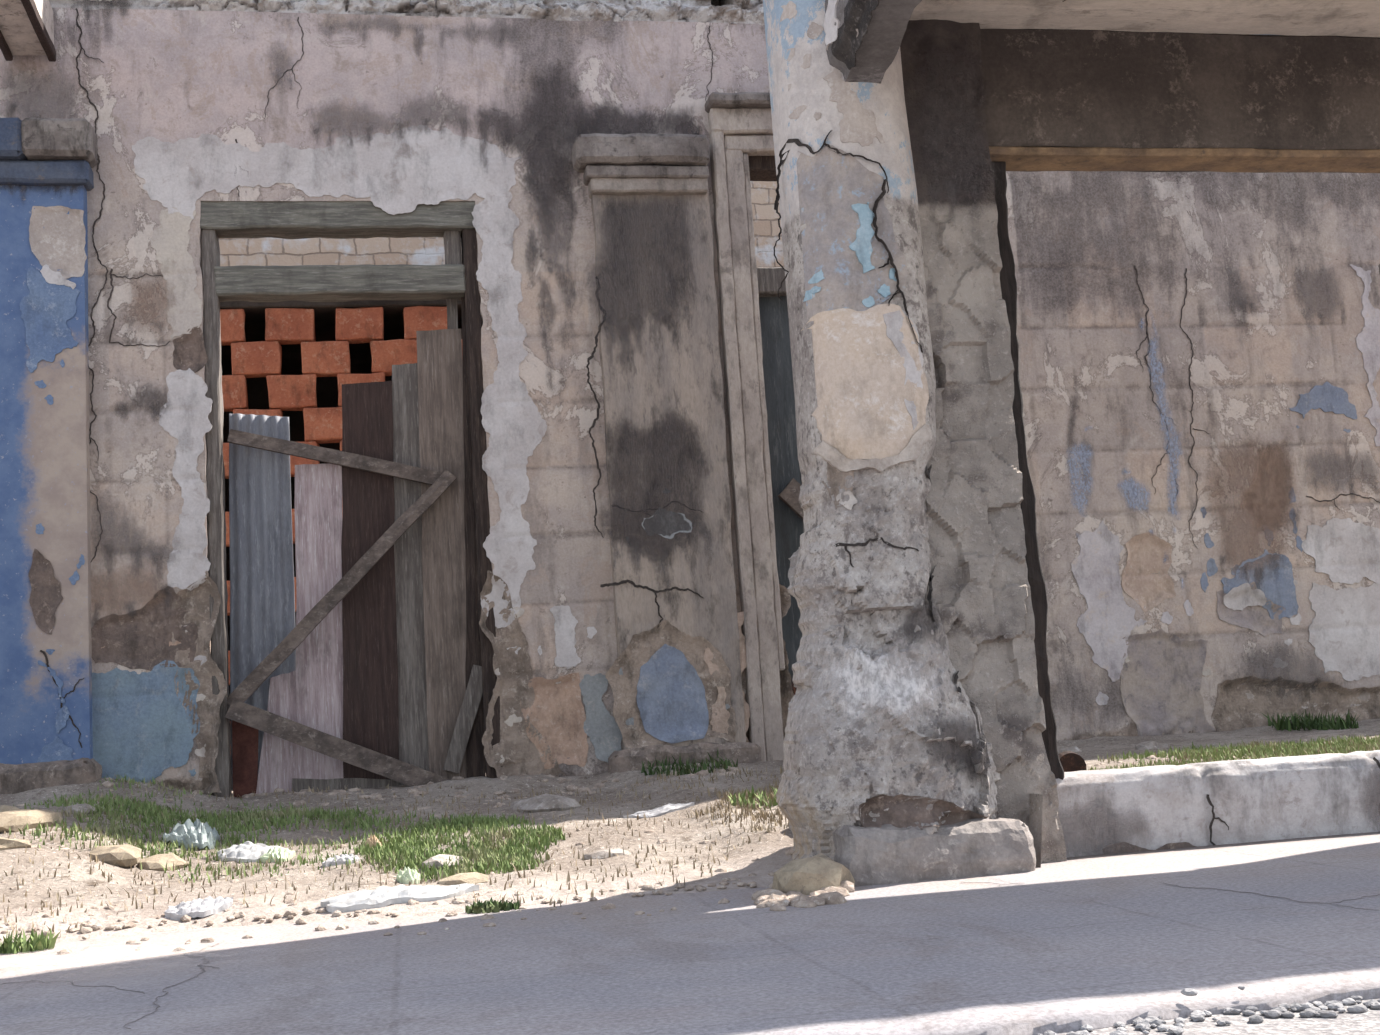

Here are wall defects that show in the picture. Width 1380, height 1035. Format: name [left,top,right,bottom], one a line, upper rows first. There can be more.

peeling [20,206,87,405]
crack [75,9,170,562]
water stain [319,67,698,266]
water stain [591,201,690,361]
crack [773,130,923,352]
water stain [606,414,710,583]
spalling [813,432,858,510]
crack [1134,265,1209,548]
crack [600,579,703,627]
spalling [1096,487,1380,736]
spalling [859,794,998,829]
crack [1206,794,1229,845]